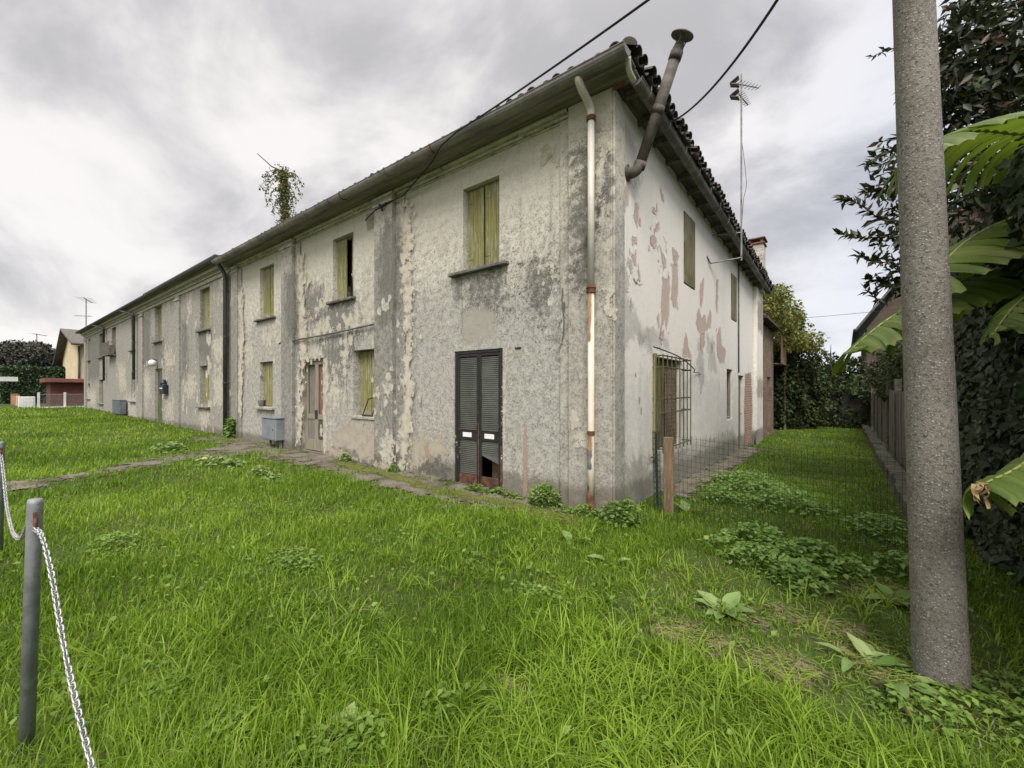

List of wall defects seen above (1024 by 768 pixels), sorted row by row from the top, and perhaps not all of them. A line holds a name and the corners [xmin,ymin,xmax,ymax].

peeling [116,277,281,433]
damp [286,273,363,386]
peeling [295,198,457,471]
damp [455,141,615,327]
peeling [600,217,678,321]